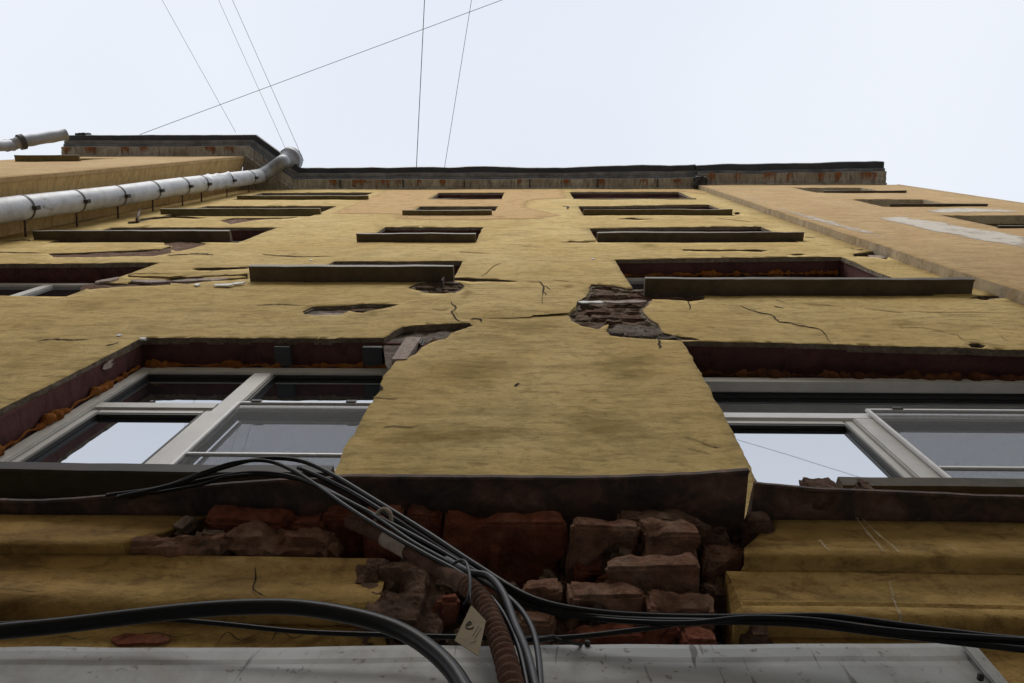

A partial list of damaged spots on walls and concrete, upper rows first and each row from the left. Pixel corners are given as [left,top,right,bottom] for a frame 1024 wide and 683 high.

spalling [303,305,392,314]
spalling [570,286,691,341]
crack [740,304,1013,345]
flaking render [130,504,775,646]